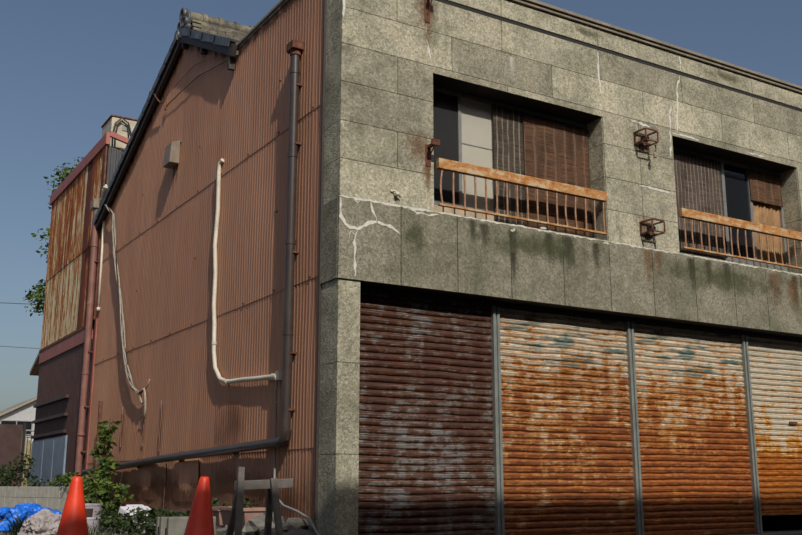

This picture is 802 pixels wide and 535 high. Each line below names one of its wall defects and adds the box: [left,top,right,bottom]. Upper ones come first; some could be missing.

crack [339,197,400,275]
damp [505,229,572,264]